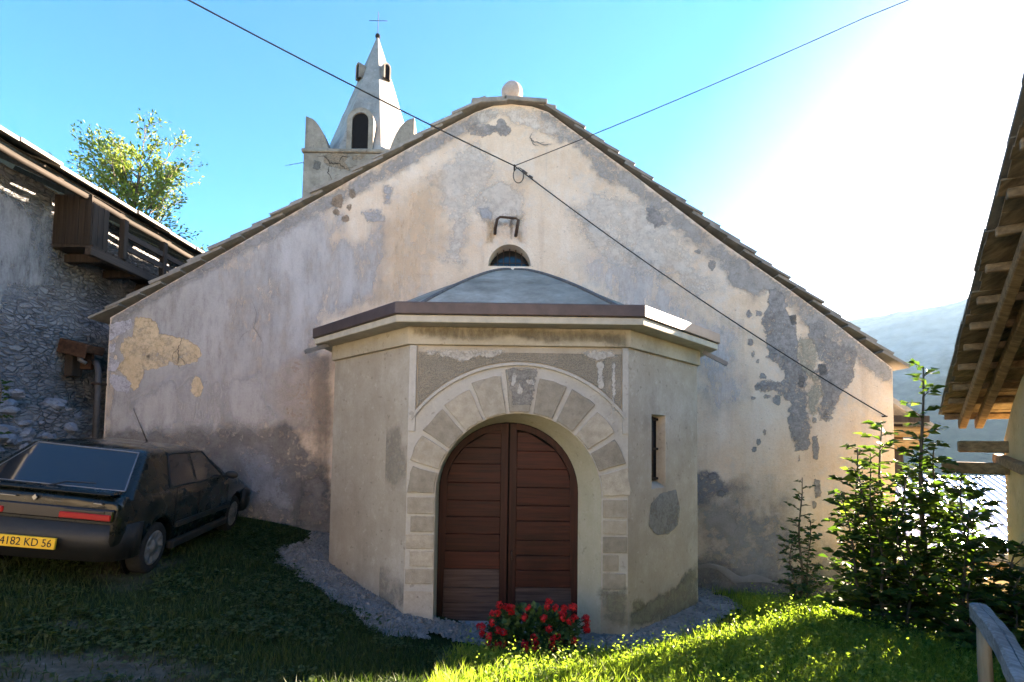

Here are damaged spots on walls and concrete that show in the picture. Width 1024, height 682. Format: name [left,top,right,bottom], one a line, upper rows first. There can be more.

flaking render [331,189,355,222]
flaking render [108,317,202,393]
damp [107,110,492,533]
spalling [508,368,537,405]
flaking render [746,289,857,461]
flaking render [813,479,822,509]
damp [602,471,857,625]